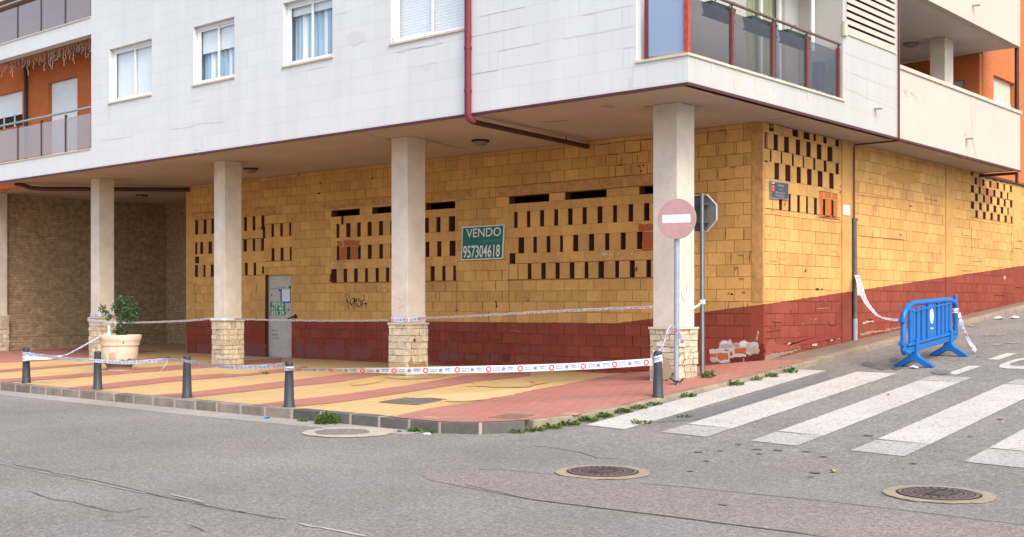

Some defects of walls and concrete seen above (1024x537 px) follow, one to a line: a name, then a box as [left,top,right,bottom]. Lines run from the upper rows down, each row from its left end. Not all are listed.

peeling [709,331,760,363]